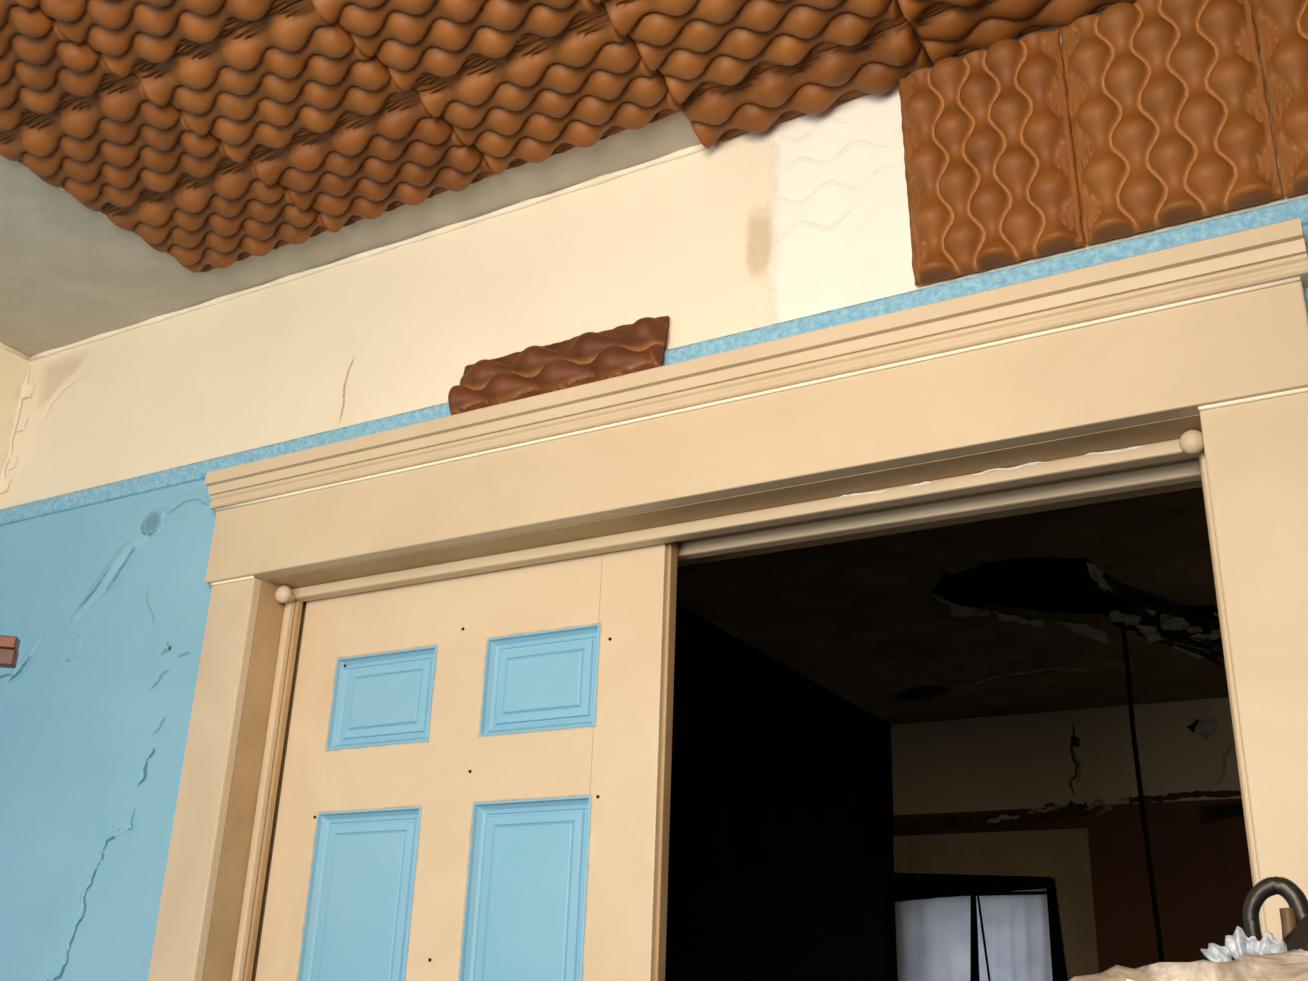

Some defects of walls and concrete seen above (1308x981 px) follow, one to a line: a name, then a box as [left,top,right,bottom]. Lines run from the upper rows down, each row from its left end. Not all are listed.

crack [146,596,190,688]
crack [42,717,165,981]